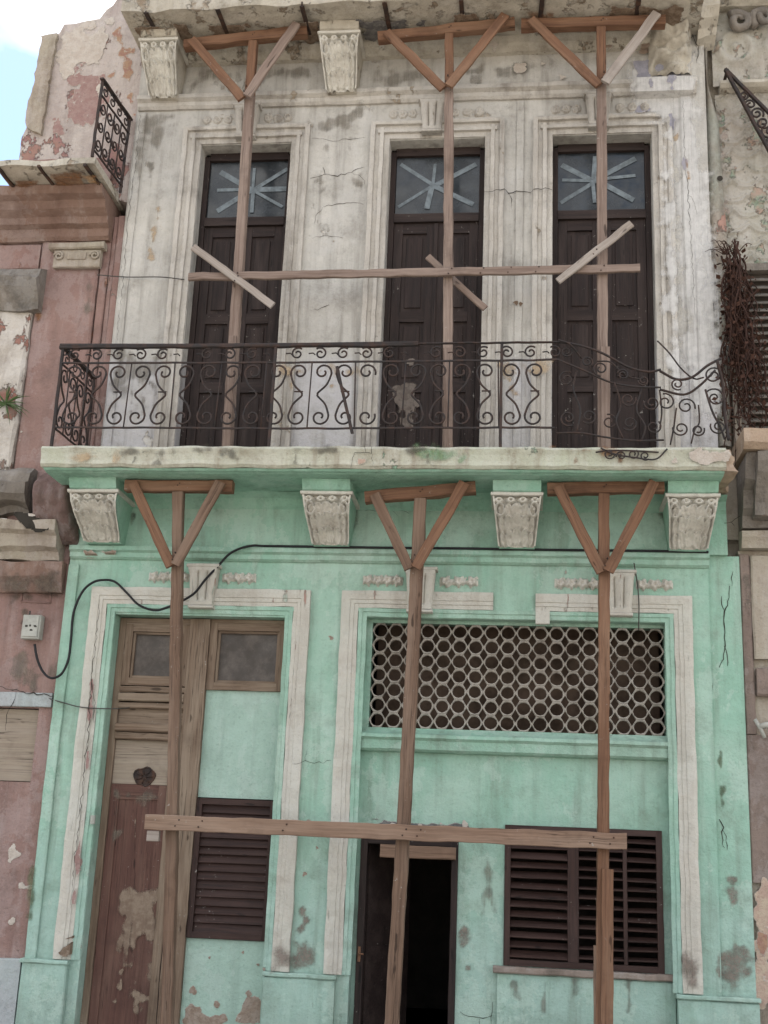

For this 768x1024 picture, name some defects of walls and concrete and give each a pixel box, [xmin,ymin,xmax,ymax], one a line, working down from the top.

spalling [209,23,251,35]
peeling [52,17,193,136]
crack [313,167,365,238]
peeling [672,447,732,465]
crack [719,572,733,667]
peeling [8,843,21,863]
water stain [276,945,314,967]
peeling [681,955,697,985]
peeling [717,877,768,1010]
peeling [182,985,261,1024]